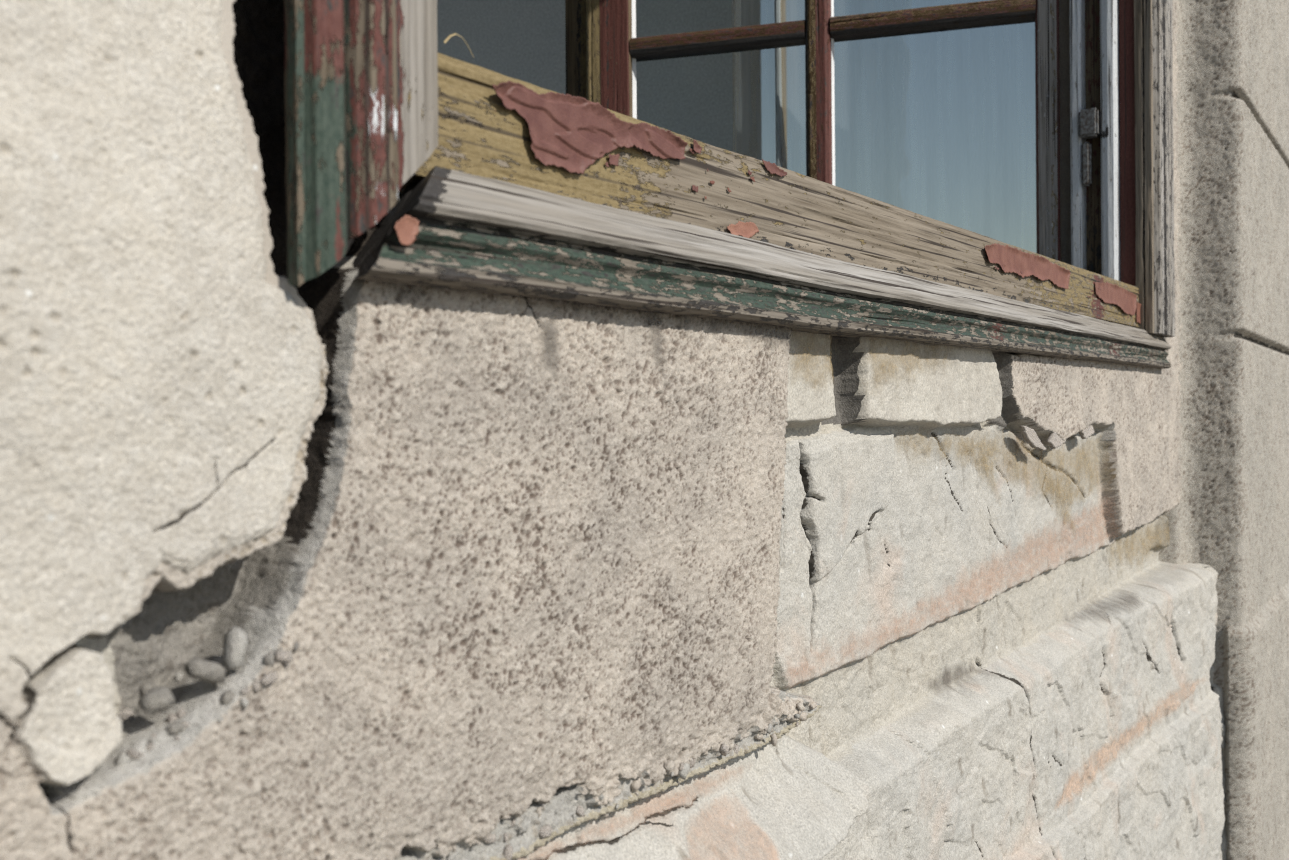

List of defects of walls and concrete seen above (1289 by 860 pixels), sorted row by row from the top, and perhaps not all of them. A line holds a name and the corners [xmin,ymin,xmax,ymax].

peeling [492,81,702,174]
peeling [394,215,419,246]
peeling [984,243,1071,289]
peeling [1088,281,1141,323]
spalling [16,268,365,815]
crack [782,457,821,579]
crack [850,511,890,567]
crack [931,433,1085,548]
crack [0,657,35,755]
crack [976,663,1027,697]
spalling [394,690,822,860]
crack [544,797,698,860]